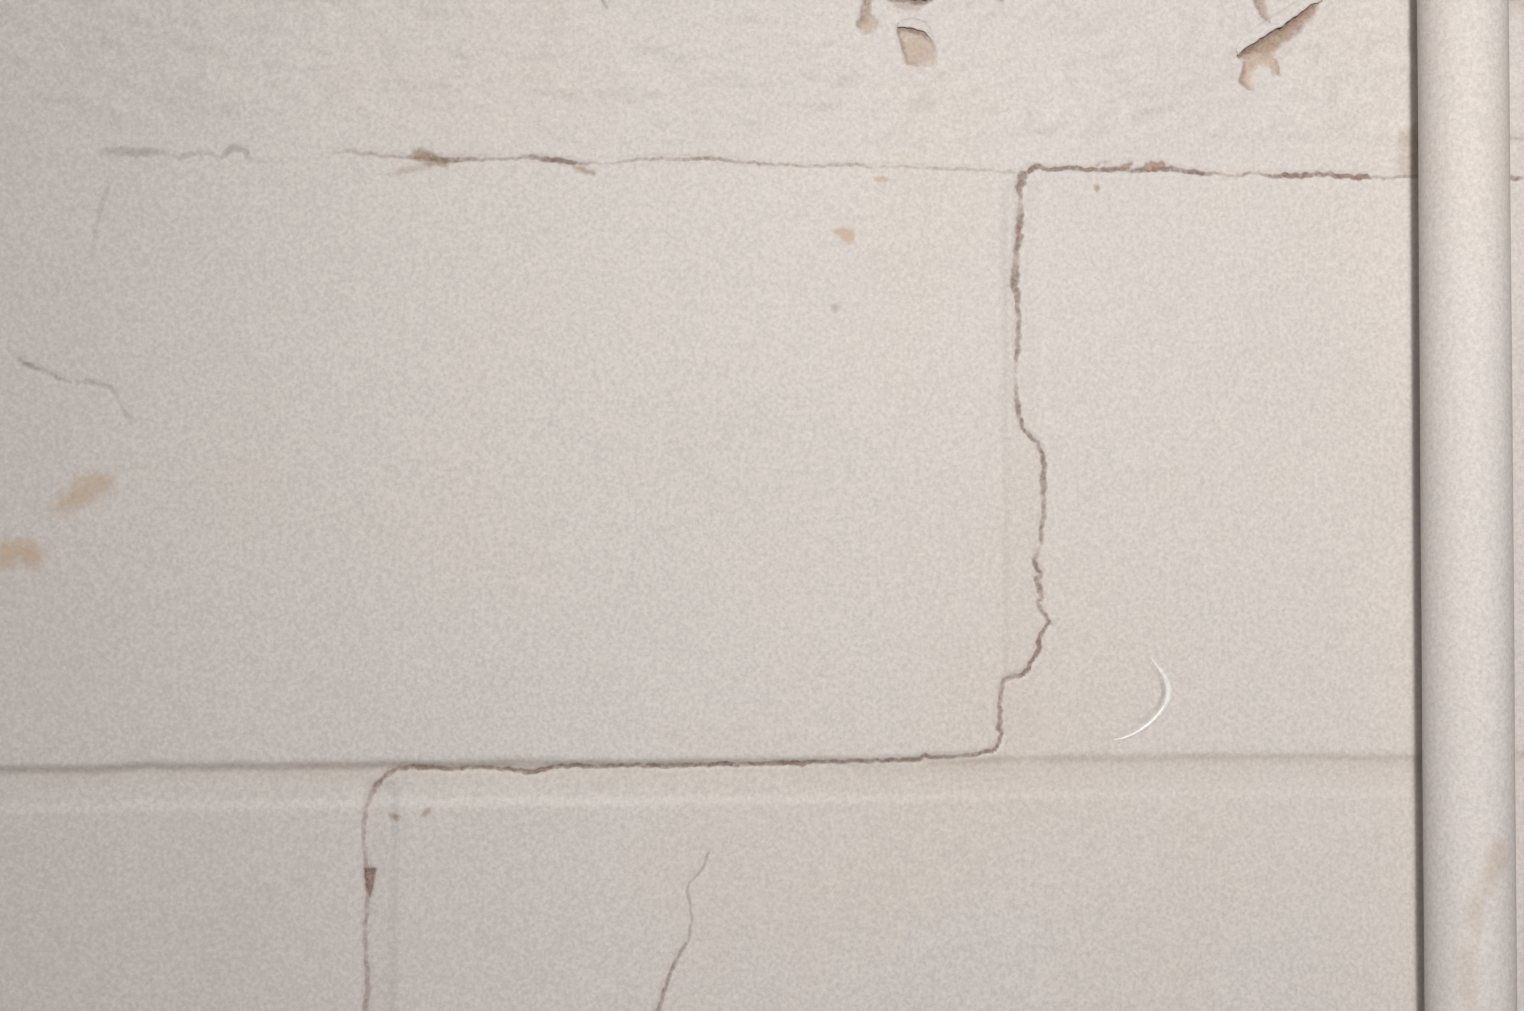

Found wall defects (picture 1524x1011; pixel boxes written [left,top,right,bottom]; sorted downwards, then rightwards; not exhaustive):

peeling [896,0,933,59]
peeling [1236,0,1321,85]
crack [416,153,469,164]
crack [534,156,576,164]
crack [1270,172,1370,180]
crack [1011,162,1205,355]
crack [378,403,1048,783]
crack [364,868,375,895]